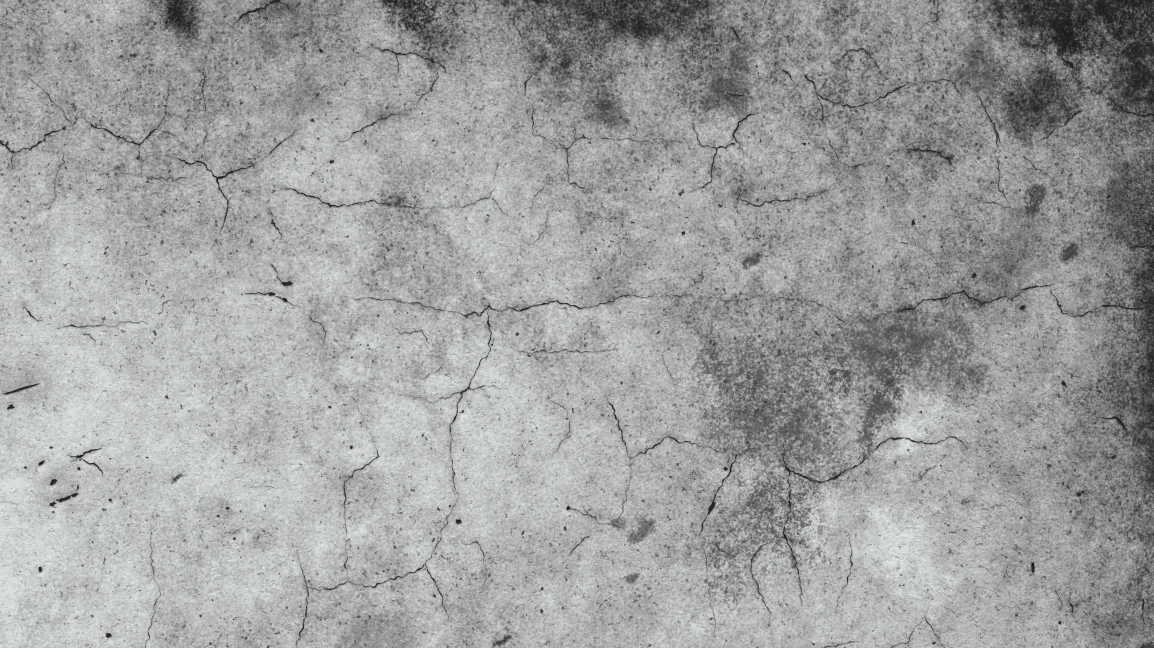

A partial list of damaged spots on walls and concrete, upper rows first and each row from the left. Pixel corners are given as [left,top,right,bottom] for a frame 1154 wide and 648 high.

crack [234,0,290,23]
crack [0,73,294,233]
crack [336,48,447,142]
crack [524,48,1154,245]
crack [245,163,503,345]
crack [296,284,1154,648]
crack [145,527,161,648]